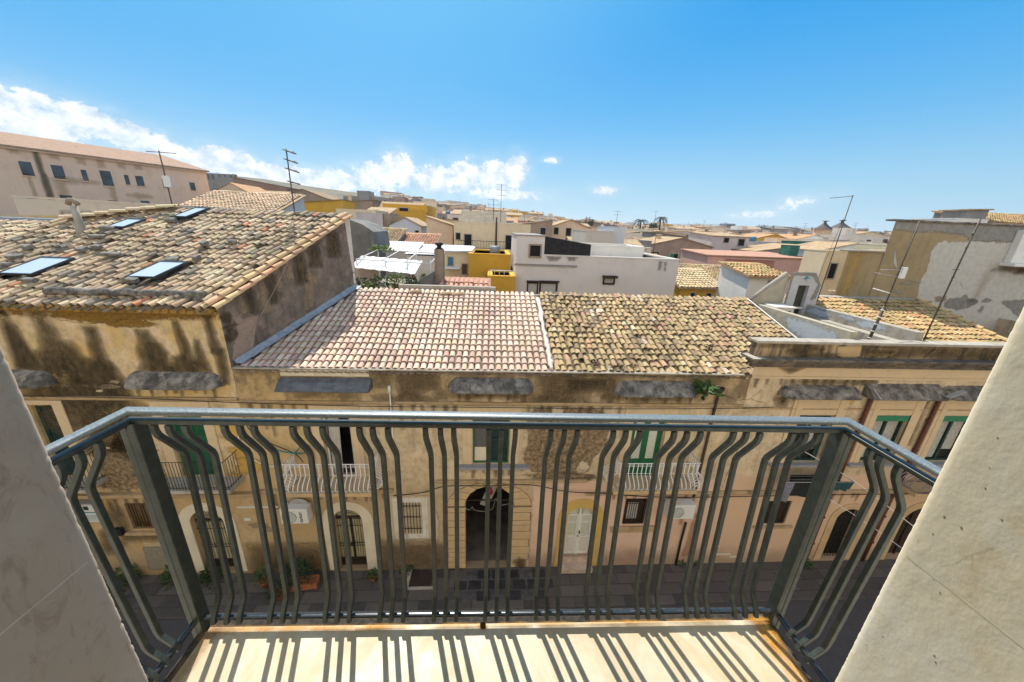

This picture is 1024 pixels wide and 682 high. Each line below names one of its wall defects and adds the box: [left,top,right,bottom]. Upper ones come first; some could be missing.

damp [137,234,339,394]
peeling [935,295,1024,317]
damp [0,311,158,553]
peeling [523,406,609,479]